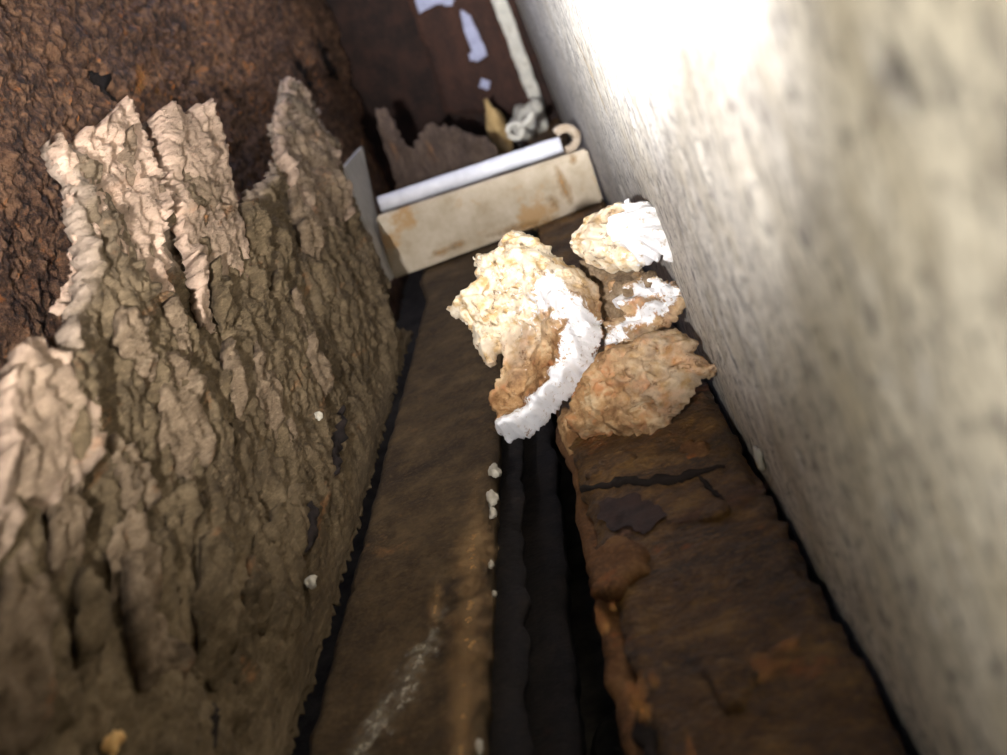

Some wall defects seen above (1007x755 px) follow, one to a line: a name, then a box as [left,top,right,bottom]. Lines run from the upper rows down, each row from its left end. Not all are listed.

peeling [415,0,487,62]
spalling [88,71,117,102]
corrosion [0,74,413,755]
crack [579,465,725,500]